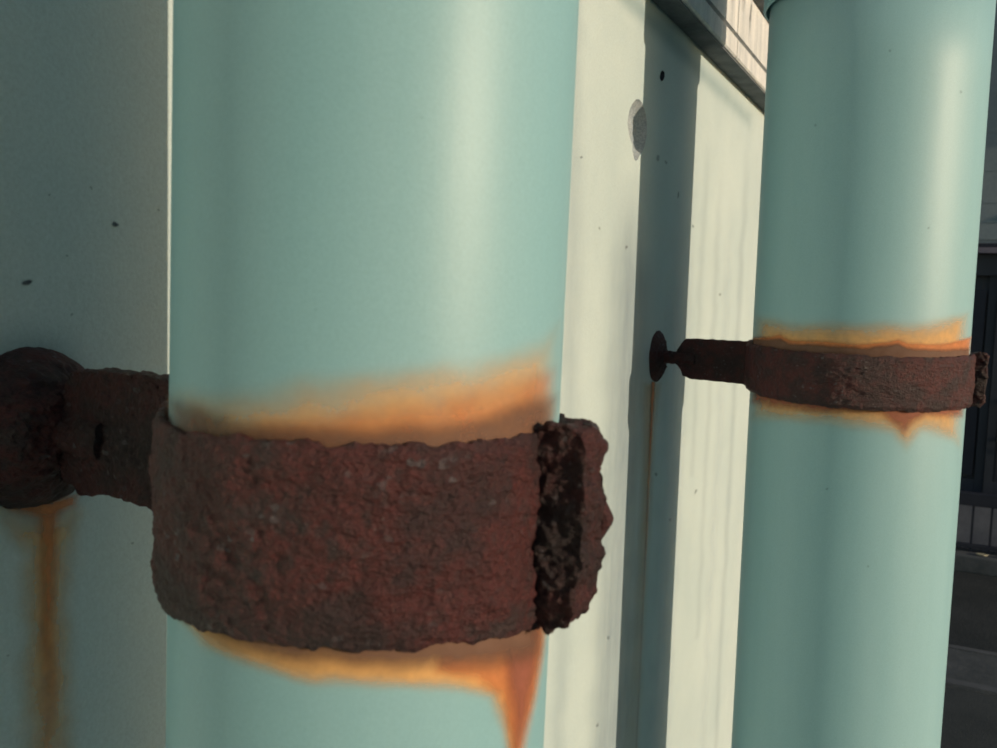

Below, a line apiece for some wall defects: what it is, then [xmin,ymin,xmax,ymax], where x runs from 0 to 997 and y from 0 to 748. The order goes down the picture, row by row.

spalling [627,99,647,161]
rust [752,322,971,358]
rust [174,373,548,448]
rust [754,394,961,436]
rust [17,498,75,739]
rust [192,625,541,748]